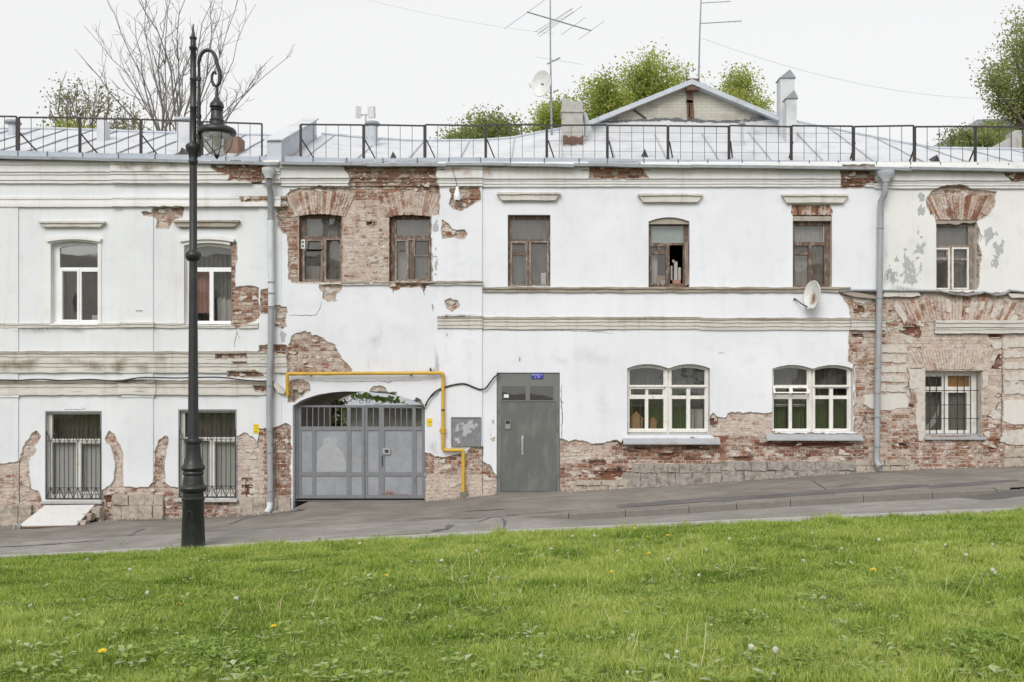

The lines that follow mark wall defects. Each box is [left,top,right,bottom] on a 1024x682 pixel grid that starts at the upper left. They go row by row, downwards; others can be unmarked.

spalling [210,160,265,184]
flaking render [141,205,184,229]
flaking render [239,160,481,302]
flaking render [215,242,352,403]
flaking render [444,298,460,312]
flaking render [560,184,1024,491]
flaking render [0,430,43,514]
flaking render [100,431,182,520]
flaking render [204,423,292,516]
flaking render [425,419,497,500]